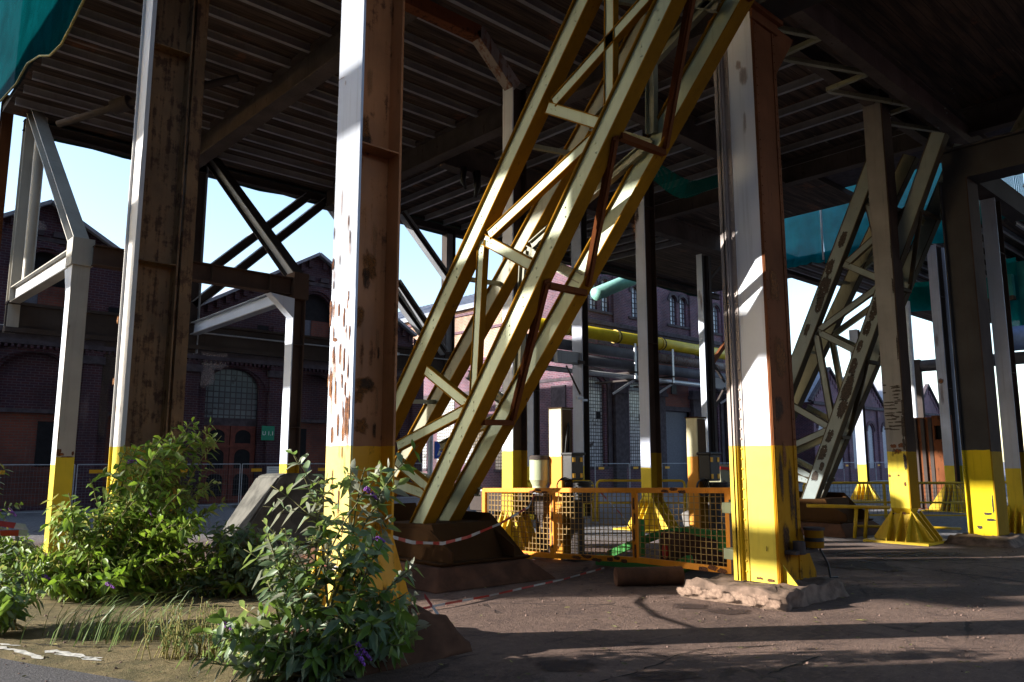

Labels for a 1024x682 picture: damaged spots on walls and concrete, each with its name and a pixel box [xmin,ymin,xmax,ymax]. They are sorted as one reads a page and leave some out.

rust [354,377,374,403]
rust [355,418,376,437]